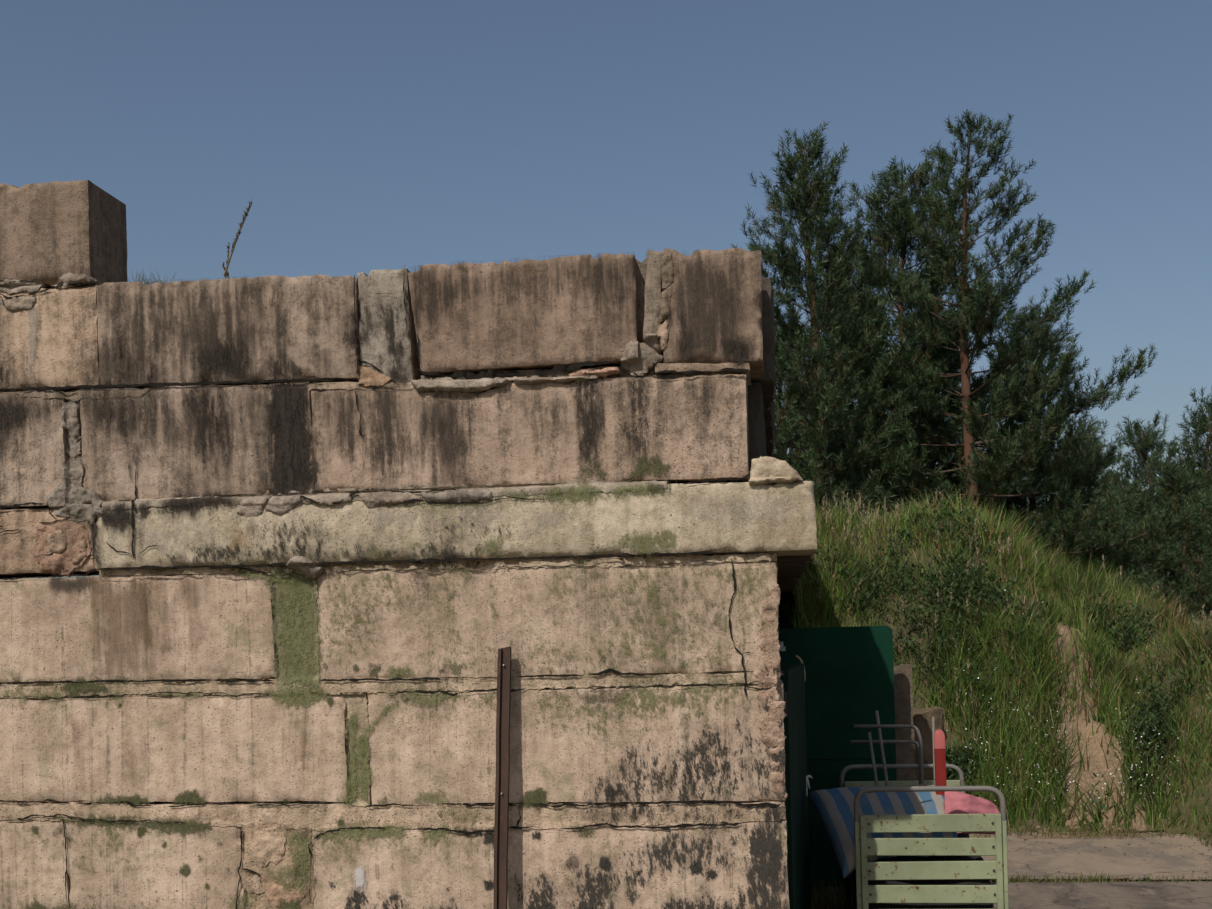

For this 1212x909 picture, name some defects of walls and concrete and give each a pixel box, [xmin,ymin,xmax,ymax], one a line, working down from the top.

water stain [668,253,751,367]
crack [0,470,287,580]
water stain [182,282,320,496]
water stain [50,493,527,651]
water stain [342,303,407,464]
crack [300,488,551,505]
crack [316,551,777,697]
water stain [570,376,660,468]
crack [671,472,802,486]
crack [0,679,274,700]
water stain [514,666,788,909]
water stain [345,866,408,909]